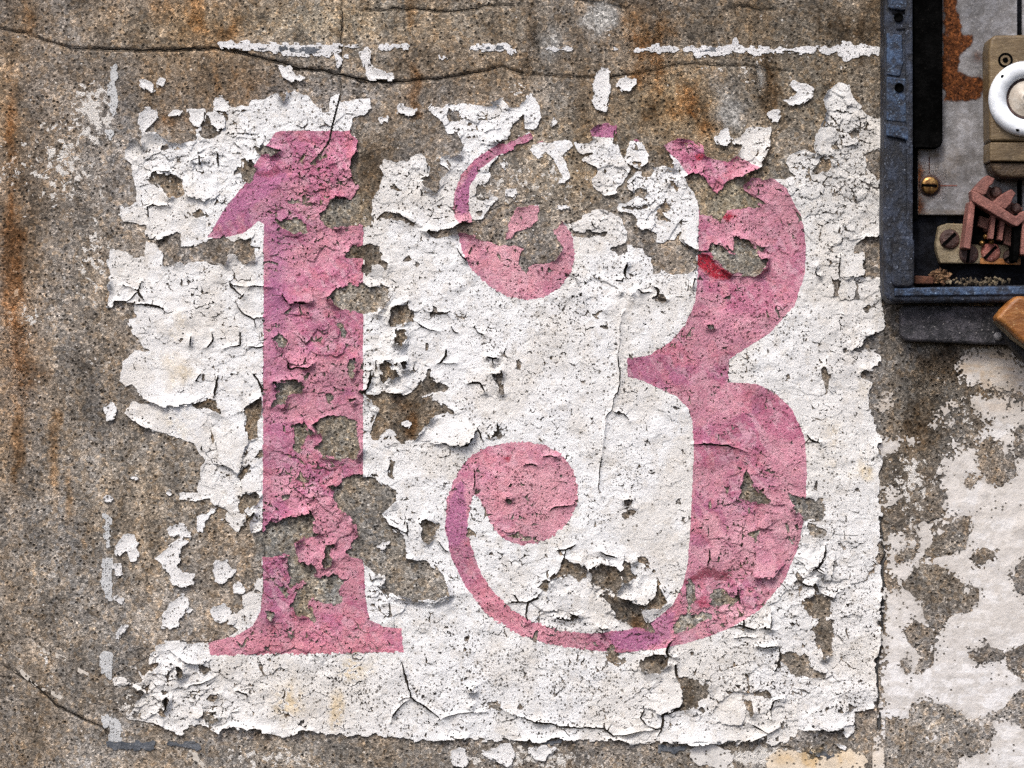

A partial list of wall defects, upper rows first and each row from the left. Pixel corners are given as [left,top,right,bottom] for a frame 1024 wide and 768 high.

crack [1,1,787,149]
corrosion [943,0,983,101]
peeling [464,143,591,274]
peeling [620,170,775,280]
peeling [103,97,477,678]
peeling [536,555,667,641]
peeling [778,583,837,680]
peeling [883,458,995,674]
crack [3,665,108,736]
crack [392,638,684,737]
peeling [638,654,771,744]
peeling [883,642,1024,768]